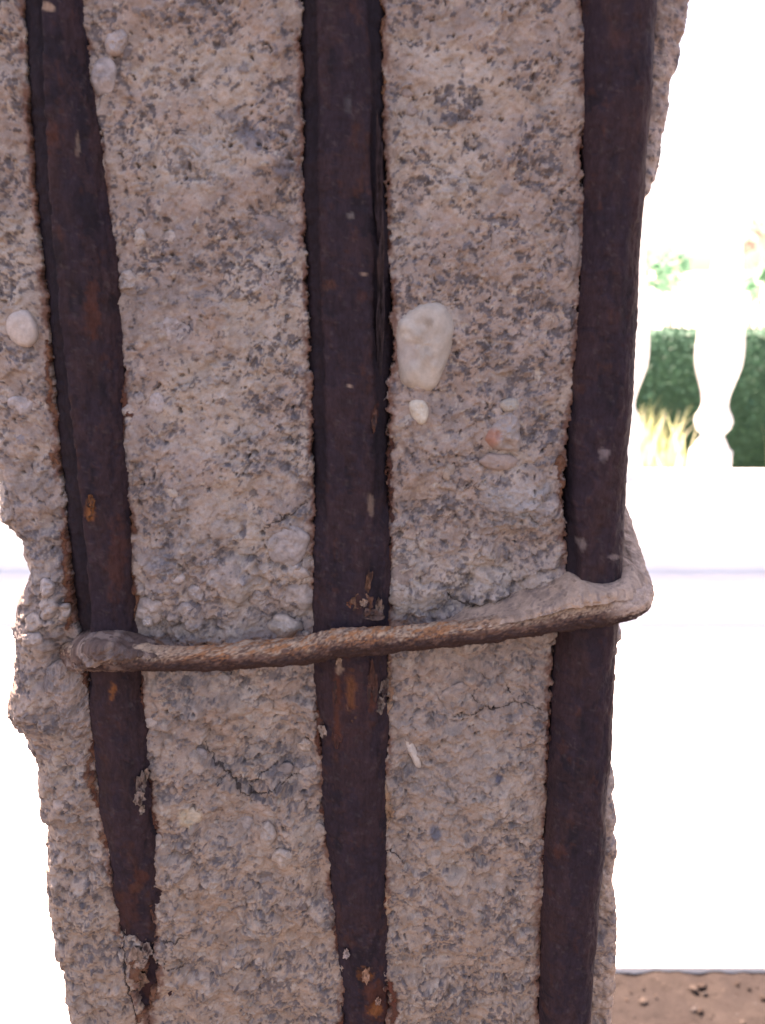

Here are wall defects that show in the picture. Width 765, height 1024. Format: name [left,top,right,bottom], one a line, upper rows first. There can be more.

rust [44,340,59,427]
rust [384,438,395,523]
rust [346,570,393,621]
rust [314,700,343,756]
crack [454,687,541,720]
rust [82,740,100,808]
rust [133,768,159,830]
crack [205,741,295,796]
rust [127,904,157,1023]
rust [331,925,350,959]
rust [361,967,370,985]
rust [375,980,399,1024]